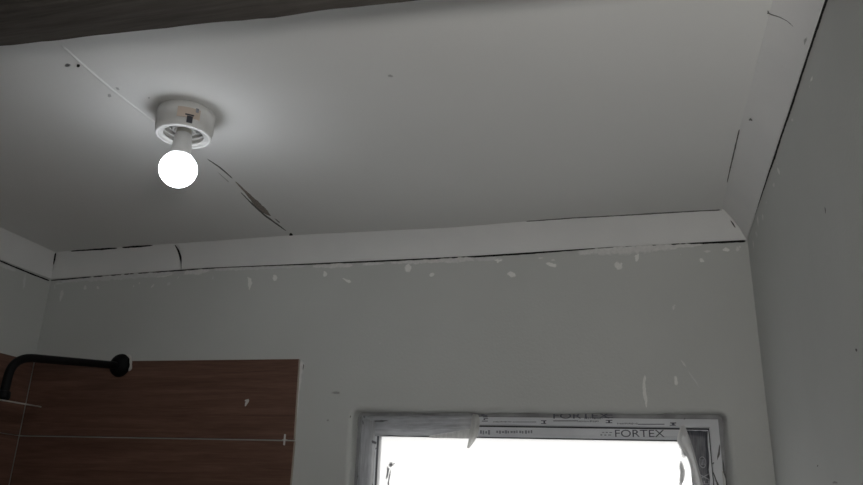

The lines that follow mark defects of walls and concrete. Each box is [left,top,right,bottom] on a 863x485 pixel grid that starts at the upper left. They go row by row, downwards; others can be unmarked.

crack [727,131,739,182]
crack [209,160,293,236]
crack [0,245,628,281]